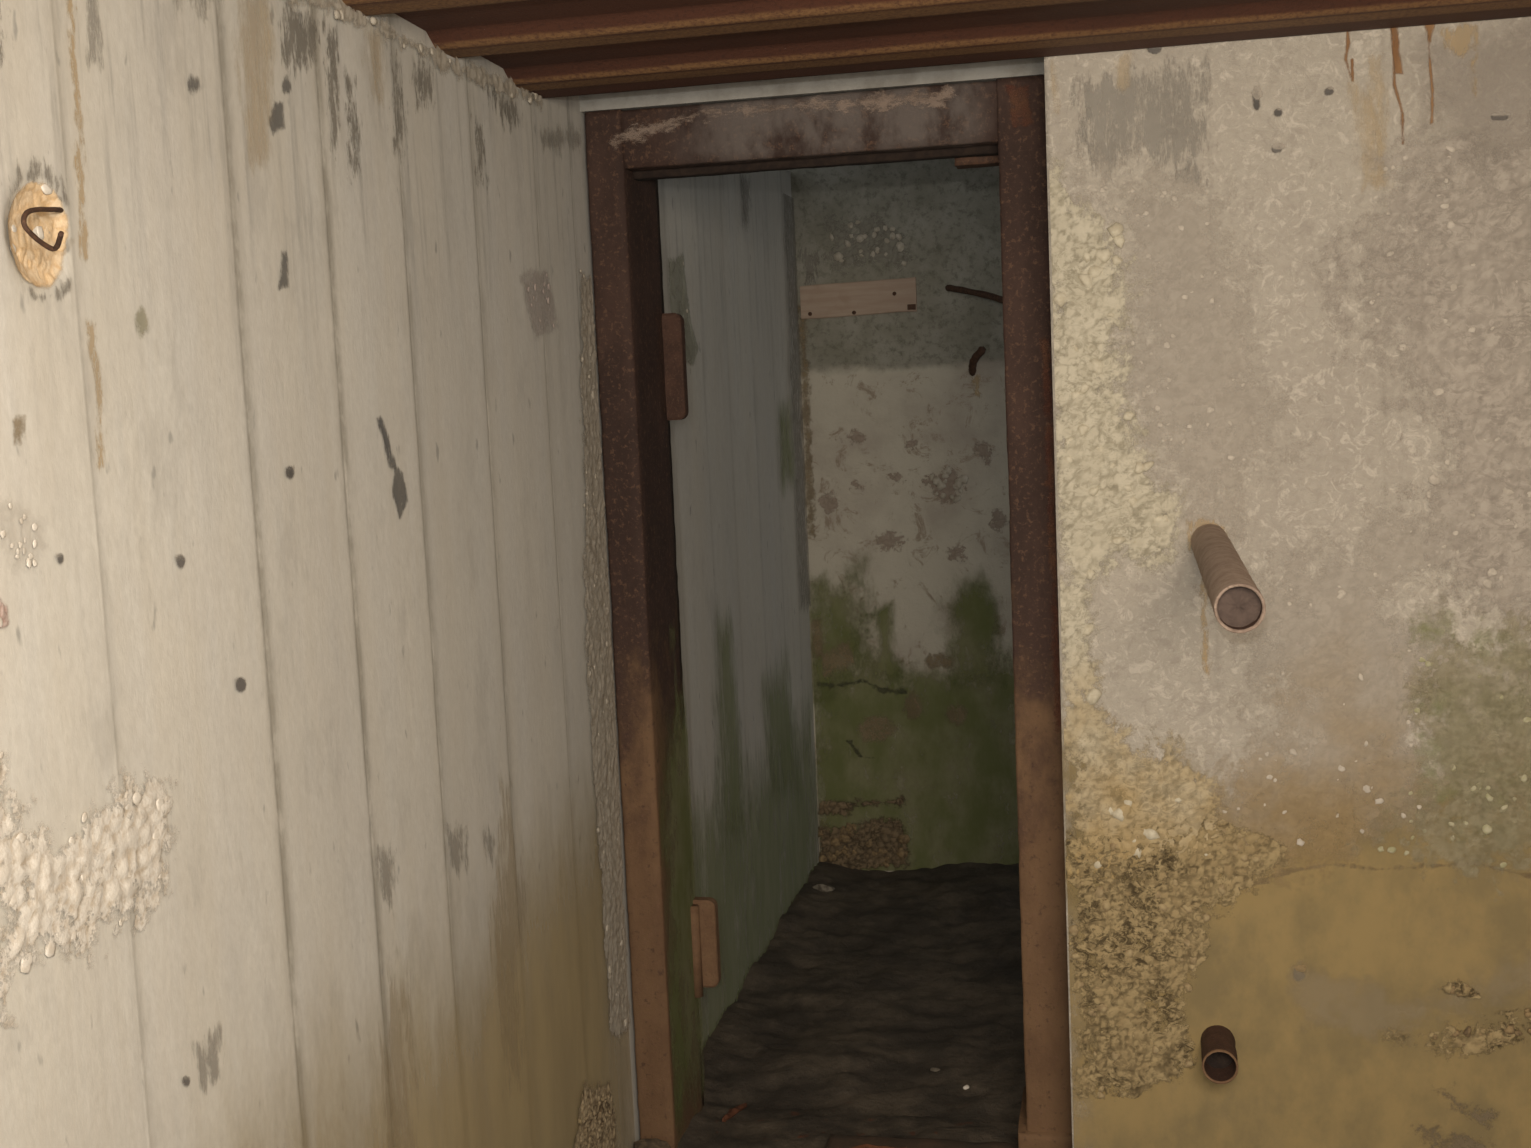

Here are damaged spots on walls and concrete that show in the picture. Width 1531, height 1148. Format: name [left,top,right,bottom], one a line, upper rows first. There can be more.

water stain [188,77,199,91]
water stain [269,4,360,167]
water stain [393,61,432,153]
spalling [288,0,542,111]
corrosion [1345,31,1354,82]
corrosion [1391,28,1404,144]
corrosion [1425,24,1435,124]
water stain [279,253,288,290]
water stain [926,582,998,683]
spalling [1049,158,1291,1099]
water stain [368,841,624,1148]
water stain [1062,749,1531,1148]